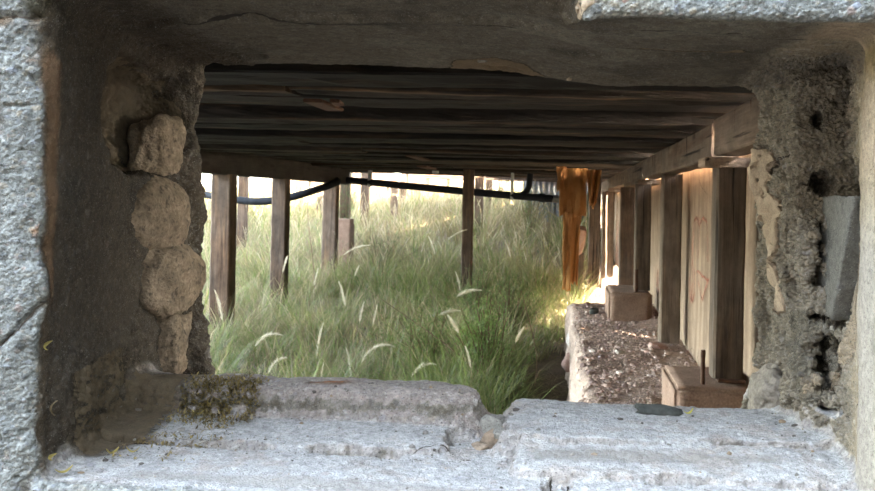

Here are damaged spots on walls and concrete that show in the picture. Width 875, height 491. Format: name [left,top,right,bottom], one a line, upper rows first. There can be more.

peeling [747,149,786,315]
crack [0,301,48,348]
peeling [802,239,860,395]